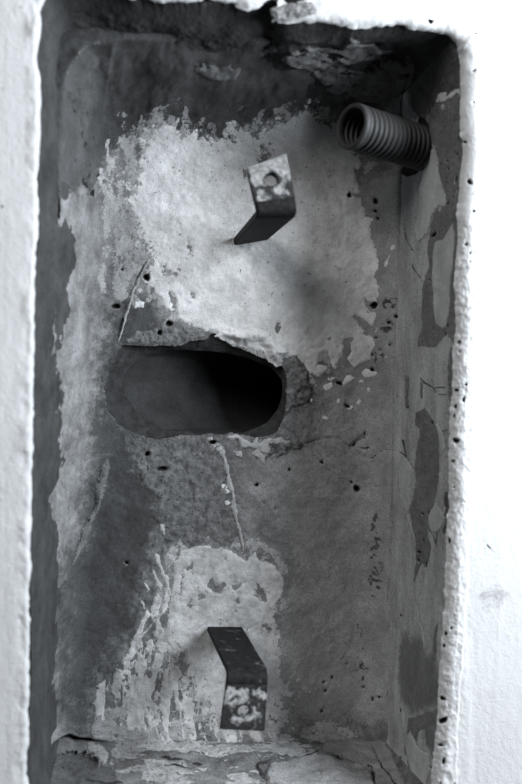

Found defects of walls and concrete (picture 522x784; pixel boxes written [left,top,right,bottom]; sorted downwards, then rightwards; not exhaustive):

peeling [414,83,463,406]
spalling [123,323,207,346]
peeling [323,369,377,391]
spalling [117,355,314,548]
peeling [398,408,450,581]
peeling [406,709,438,784]
peeling [49,751,117,784]
crack [256,760,269,776]
crack [367,748,396,784]